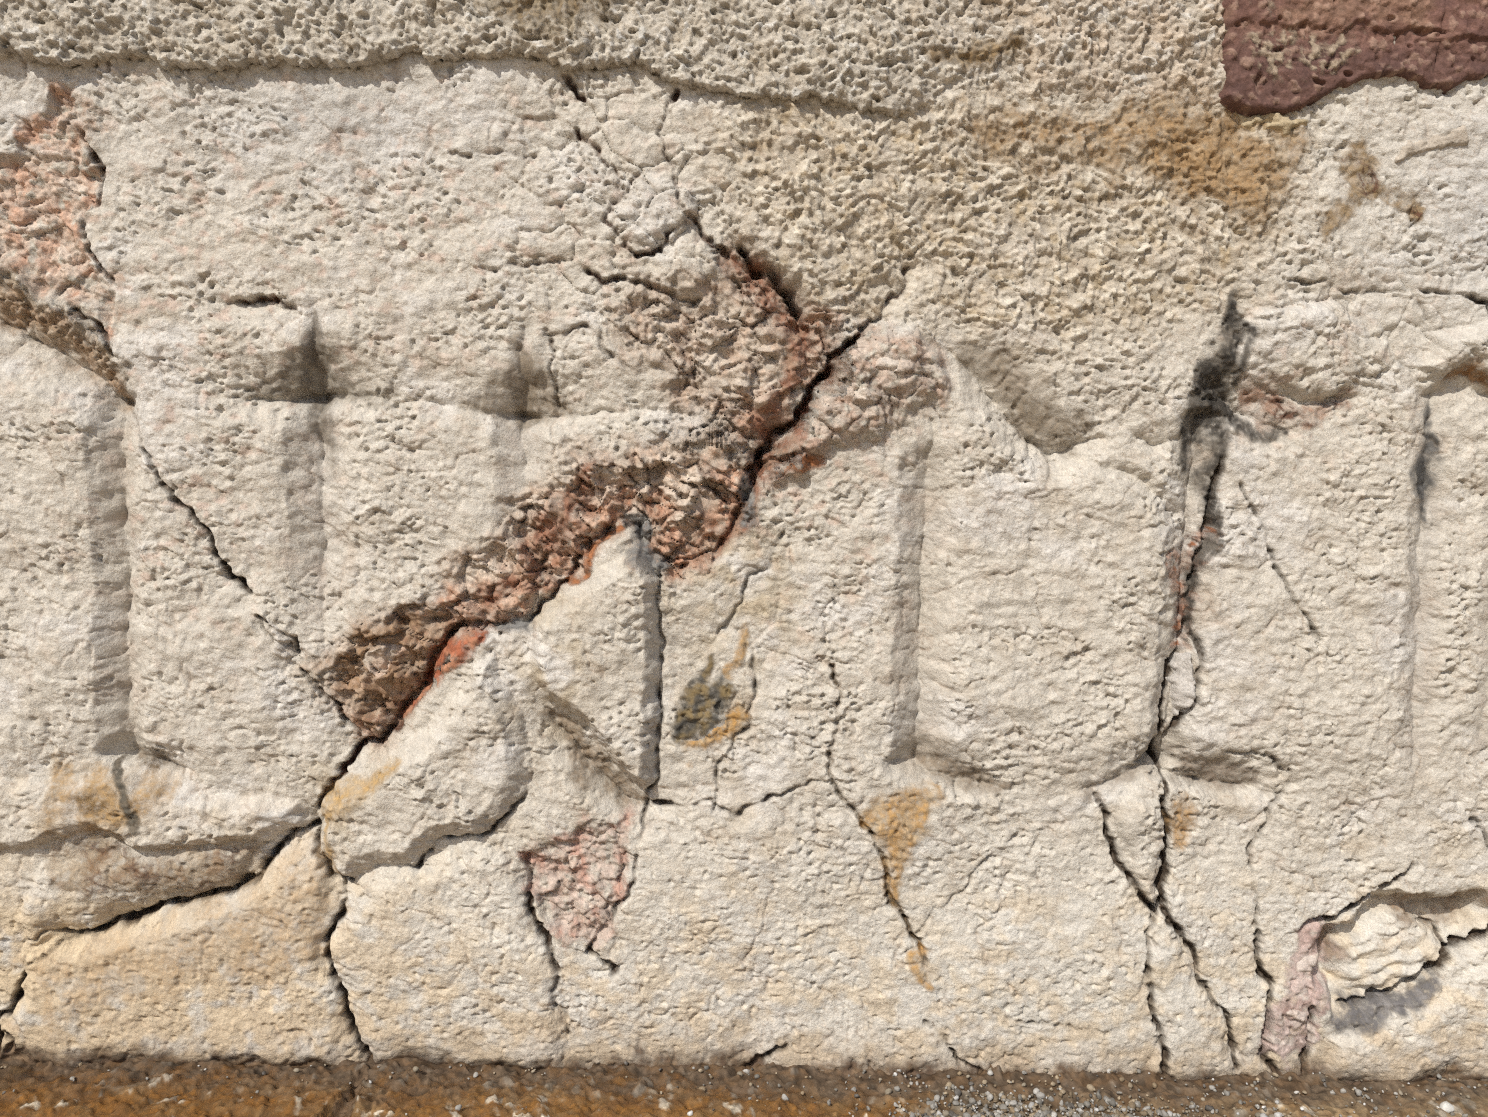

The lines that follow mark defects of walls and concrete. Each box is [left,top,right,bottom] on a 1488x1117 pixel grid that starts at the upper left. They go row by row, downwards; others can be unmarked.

flaking render [0,83,124,393]
crack [159,476,253,593]
crack [567,77,600,152]
flaking render [317,257,950,740]
crack [587,220,893,547]
leakage [1180,290,1288,632]
crack [0,522,642,1117]
flaking render [520,808,633,949]
crack [644,688,672,812]
crack [837,790,926,960]
crack [1093,459,1488,1072]
flaking render [1261,915,1341,1070]